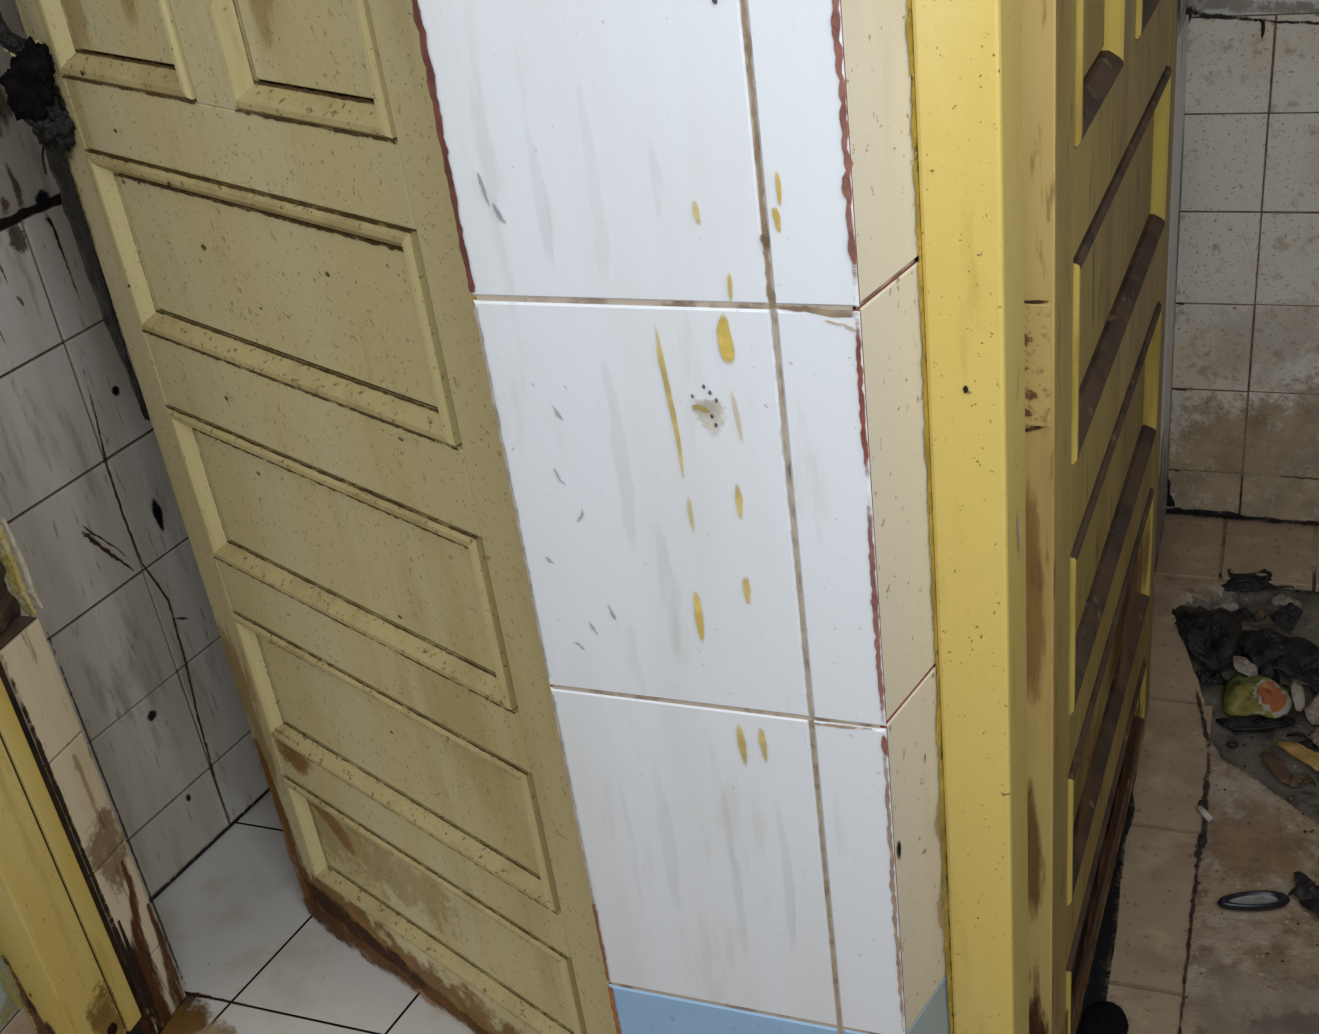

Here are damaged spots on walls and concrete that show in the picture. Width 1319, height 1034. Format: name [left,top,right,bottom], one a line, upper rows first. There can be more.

damp [1175,138,1185,307]
spalling [0,517,43,634]
damp [1115,349,1319,702]
rust [2,632,188,1034]